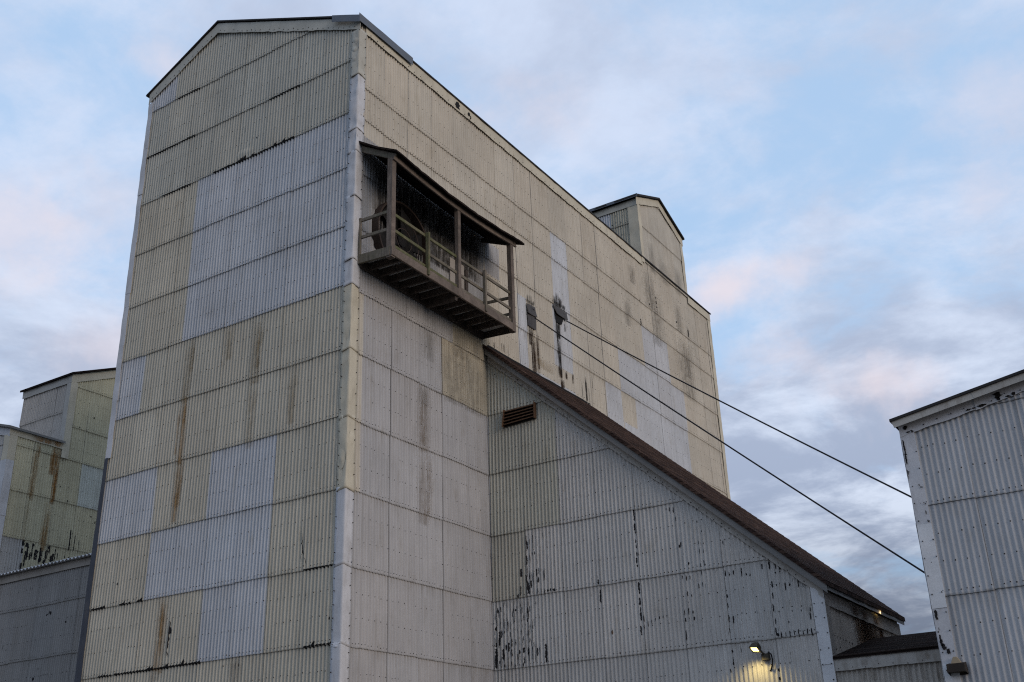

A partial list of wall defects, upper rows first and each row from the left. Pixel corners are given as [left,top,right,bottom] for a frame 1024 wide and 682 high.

rust [39,438,61,502]
peeling [19,531,79,570]
peeling [495,533,555,670]